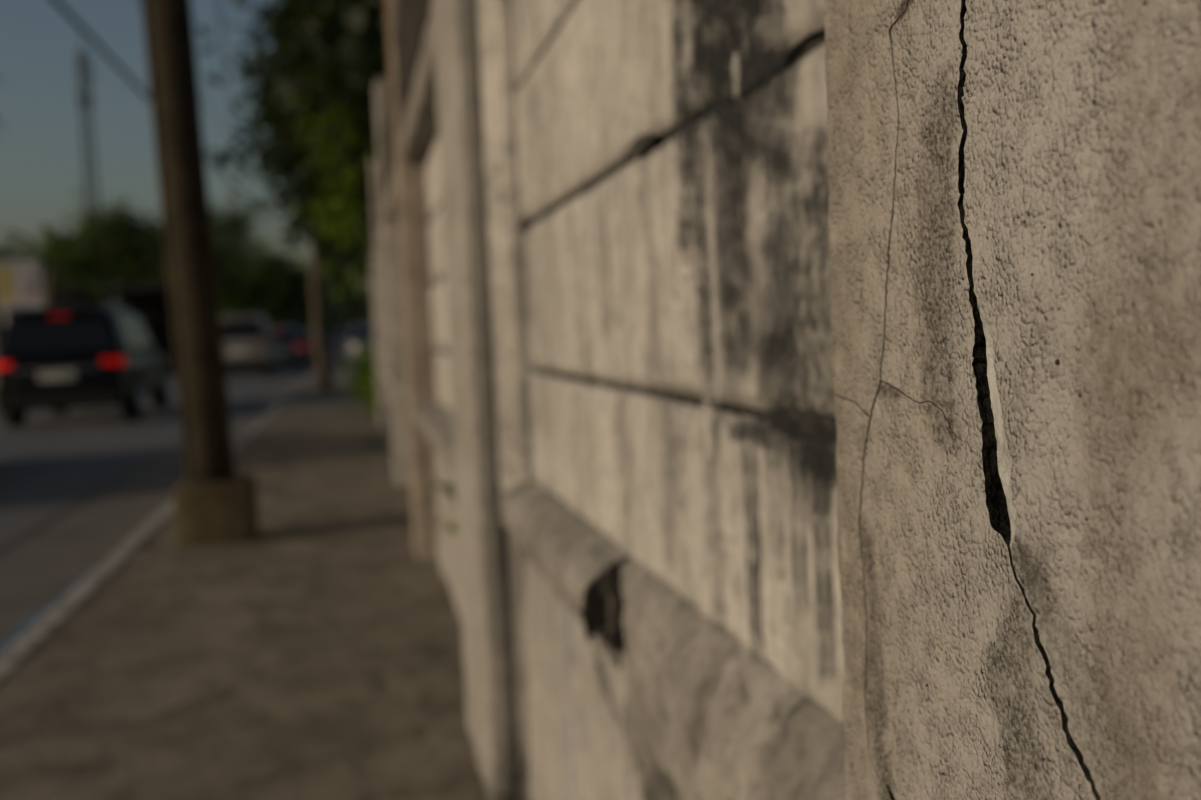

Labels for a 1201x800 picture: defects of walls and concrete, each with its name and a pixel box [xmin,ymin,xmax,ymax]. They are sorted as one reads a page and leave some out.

leakage [672,0,837,681]
crack [834,0,1101,800]